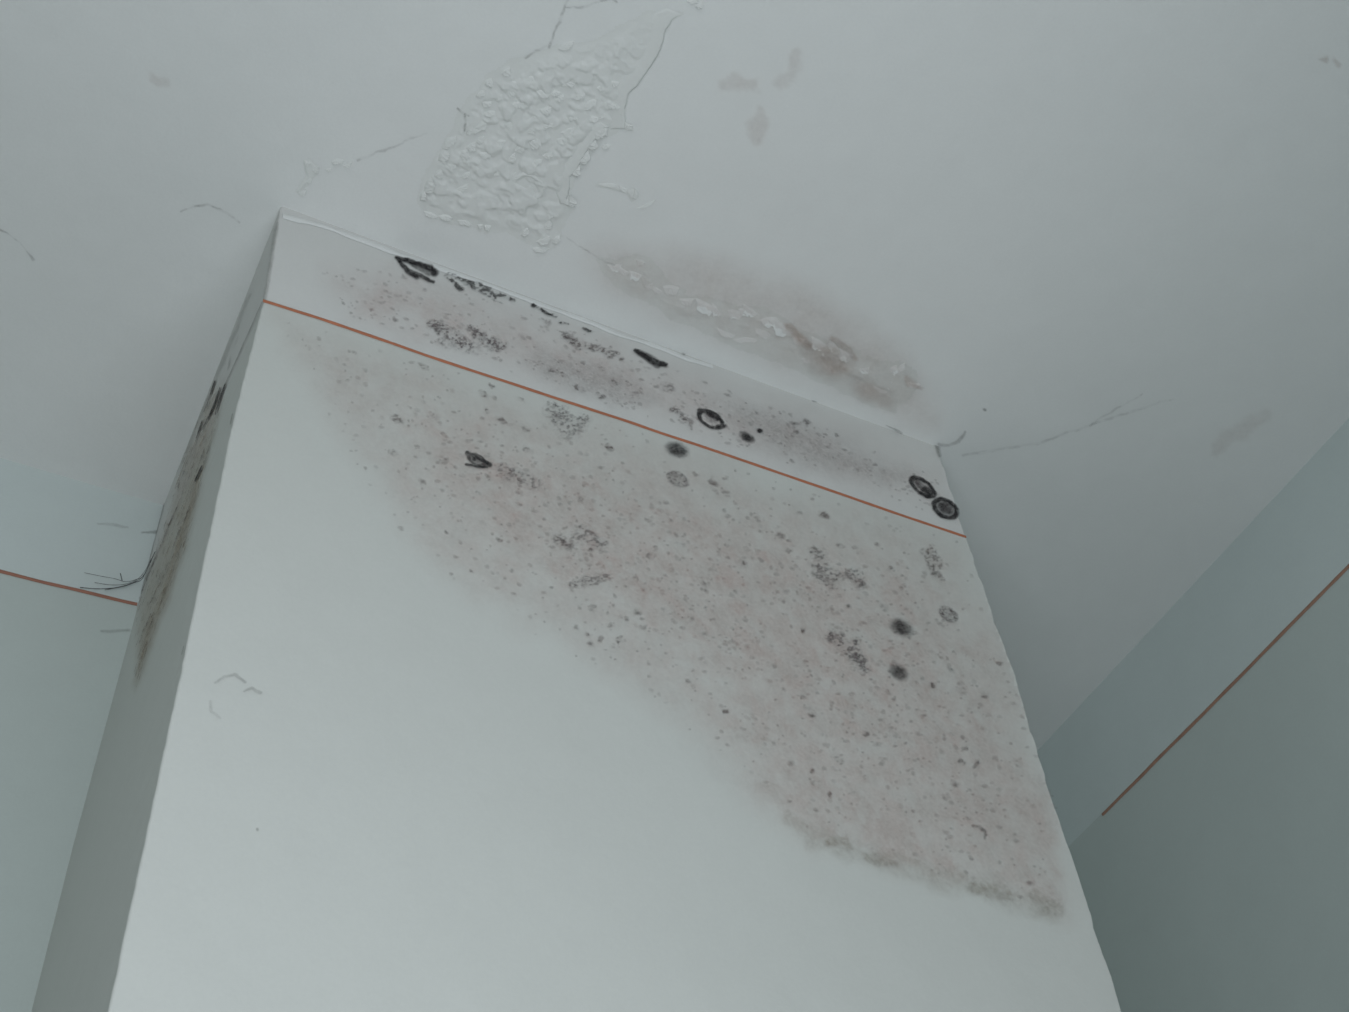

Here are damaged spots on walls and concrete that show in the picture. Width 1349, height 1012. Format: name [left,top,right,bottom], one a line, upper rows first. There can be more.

damp [395,256,515,300]
damp [428,321,504,350]
damp [531,303,668,367]
damp [196,381,225,438]
damp [697,409,725,429]
damp [465,451,492,468]
damp [669,443,686,455]
damp [909,475,959,519]
damp [894,621,909,634]
damp [829,632,869,671]